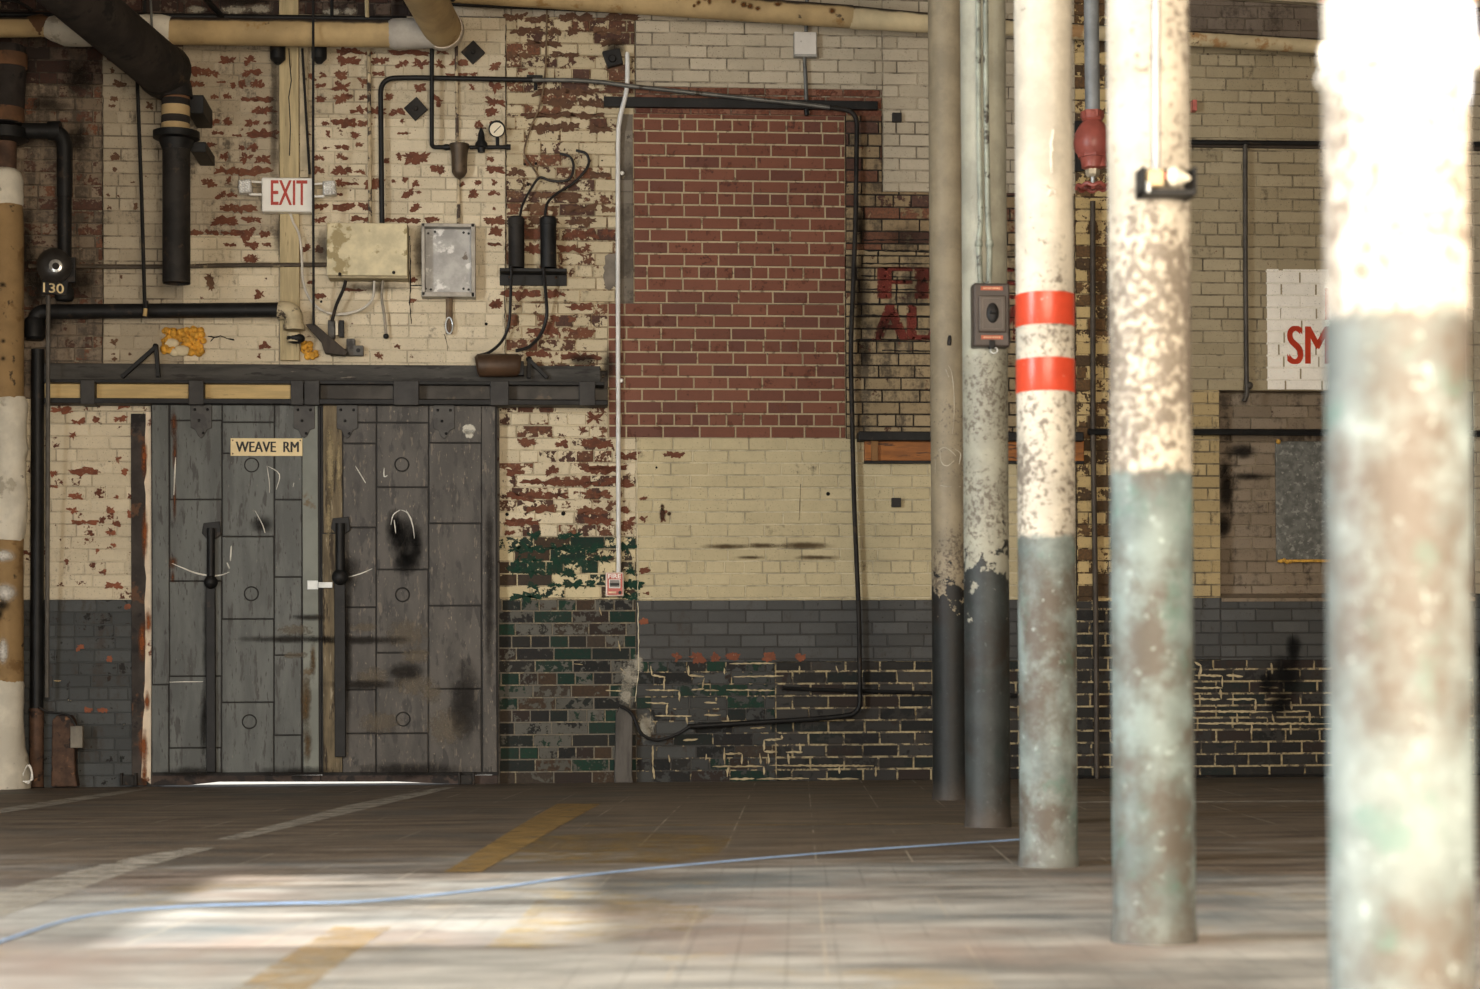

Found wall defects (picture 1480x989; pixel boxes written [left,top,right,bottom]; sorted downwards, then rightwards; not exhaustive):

peeling [107,59,127,108]
peeling [299,12,641,224]
peeling [106,152,138,210]
peeling [190,55,279,263]
peeling [460,156,616,255]
peeling [204,273,215,291]
peeling [489,289,602,361]
peeling [50,406,130,439]
peeling [50,457,131,610]
peeling [504,411,668,603]
rust [139,613,151,653]